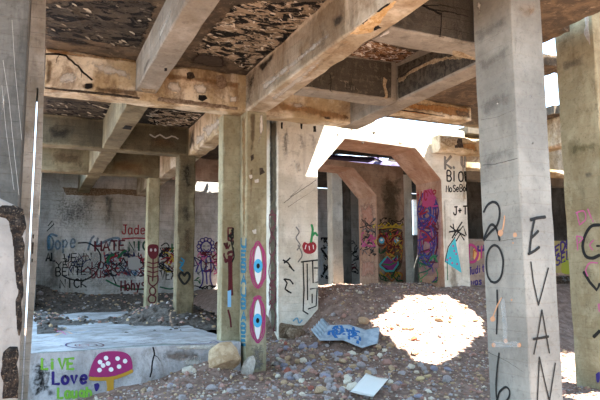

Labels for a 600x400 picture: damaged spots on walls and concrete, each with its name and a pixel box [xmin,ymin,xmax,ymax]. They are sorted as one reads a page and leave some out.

peeling [46,0,157,49]
peeling [191,0,324,70]
peeling [350,1,415,64]
crack [45,53,93,81]
peeling [45,83,238,127]
spalling [0,205,26,337]
spalling [1,346,19,399]